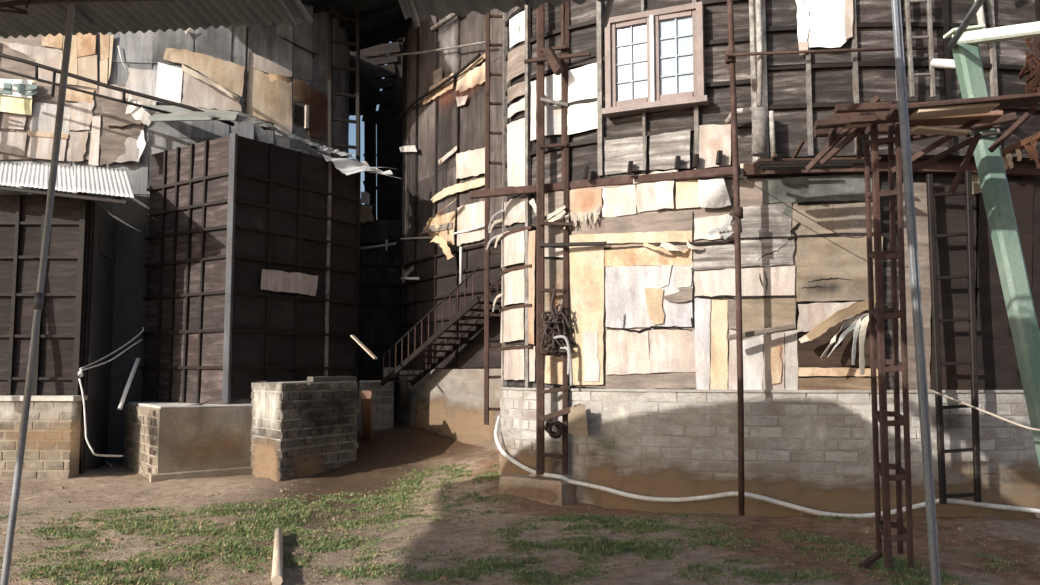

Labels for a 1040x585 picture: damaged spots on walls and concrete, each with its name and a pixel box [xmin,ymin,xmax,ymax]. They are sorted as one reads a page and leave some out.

peeling [529,199,601,230]
crack [758,223,800,296]
crack [606,296,736,333]
peeling [798,296,876,375]